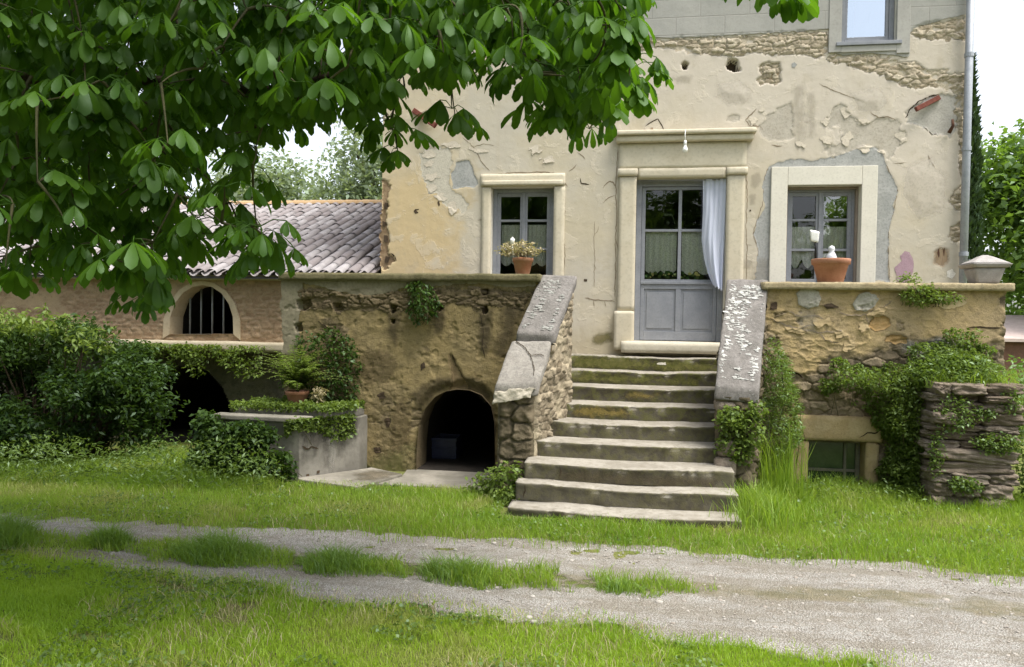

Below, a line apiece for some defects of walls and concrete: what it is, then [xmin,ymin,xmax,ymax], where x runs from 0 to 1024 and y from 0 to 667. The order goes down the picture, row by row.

flaking render [910,18,965,42]
flaking render [639,31,964,242]
flaking render [419,141,489,215]
spalling [379,180,397,270]
flaking render [780,303,907,352]